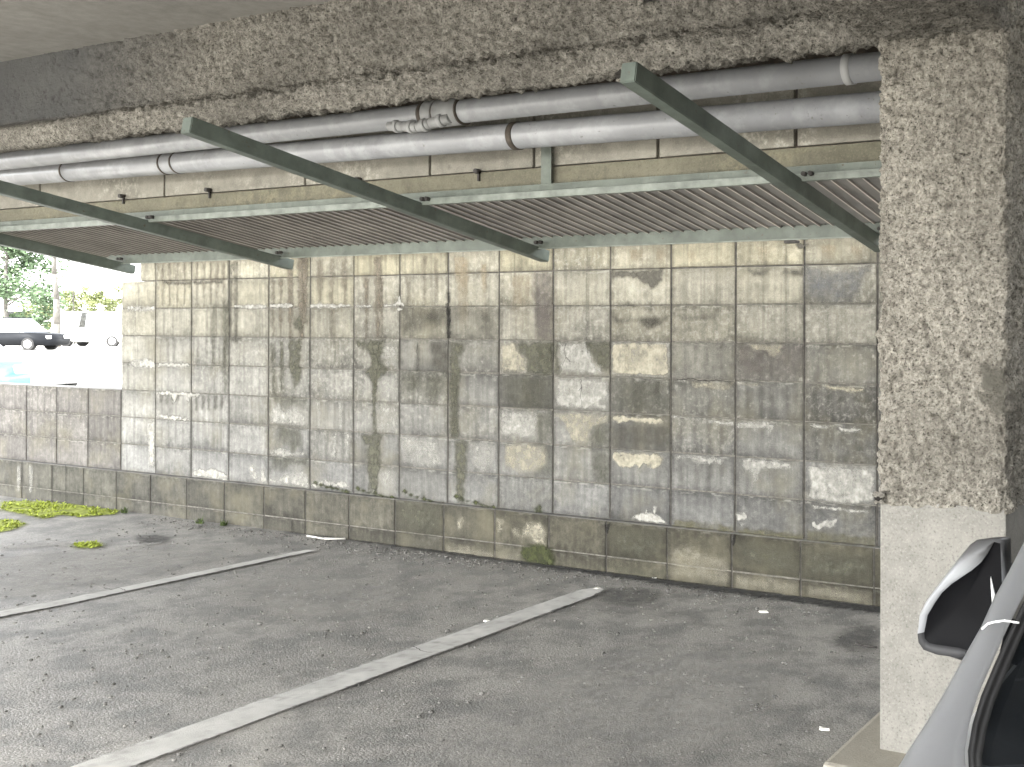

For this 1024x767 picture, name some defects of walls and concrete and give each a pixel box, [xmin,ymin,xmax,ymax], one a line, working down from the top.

damp [131,358,189,368]
damp [157,257,408,490]
damp [588,342,609,369]
damp [430,342,466,502]
damp [634,507,665,523]
damp [812,506,865,530]
damp [352,540,880,613]